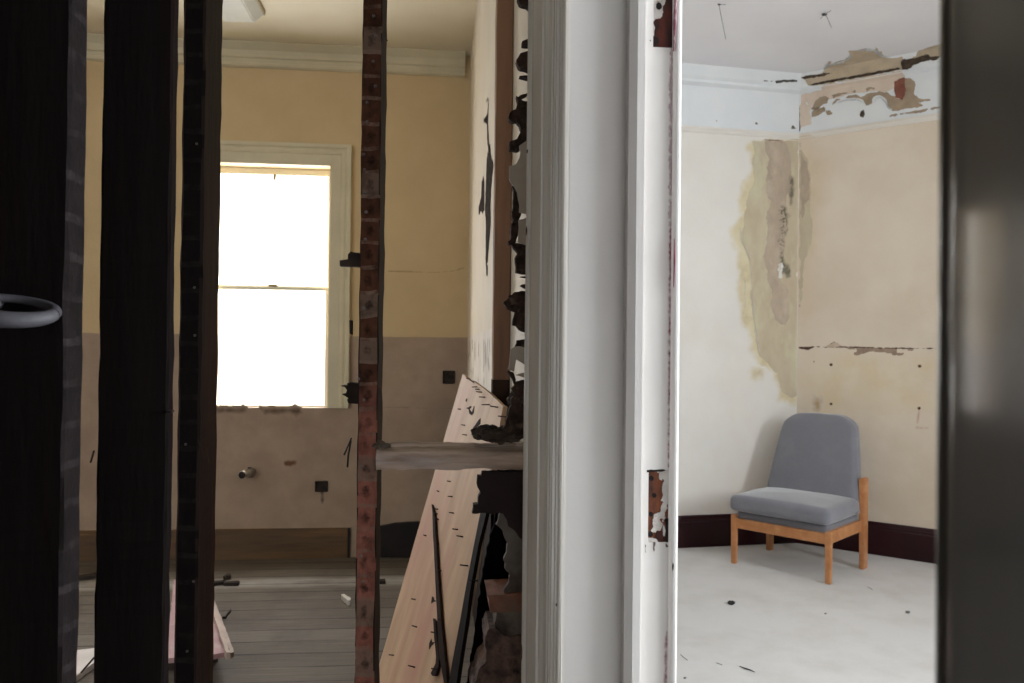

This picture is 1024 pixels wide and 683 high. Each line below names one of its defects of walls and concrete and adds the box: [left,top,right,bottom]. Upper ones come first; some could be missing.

peeling [650,0,666,41]
peeling [799,45,939,132]
spalling [503,39,528,435]
leakage [727,133,937,427]
peeling [648,470,669,543]